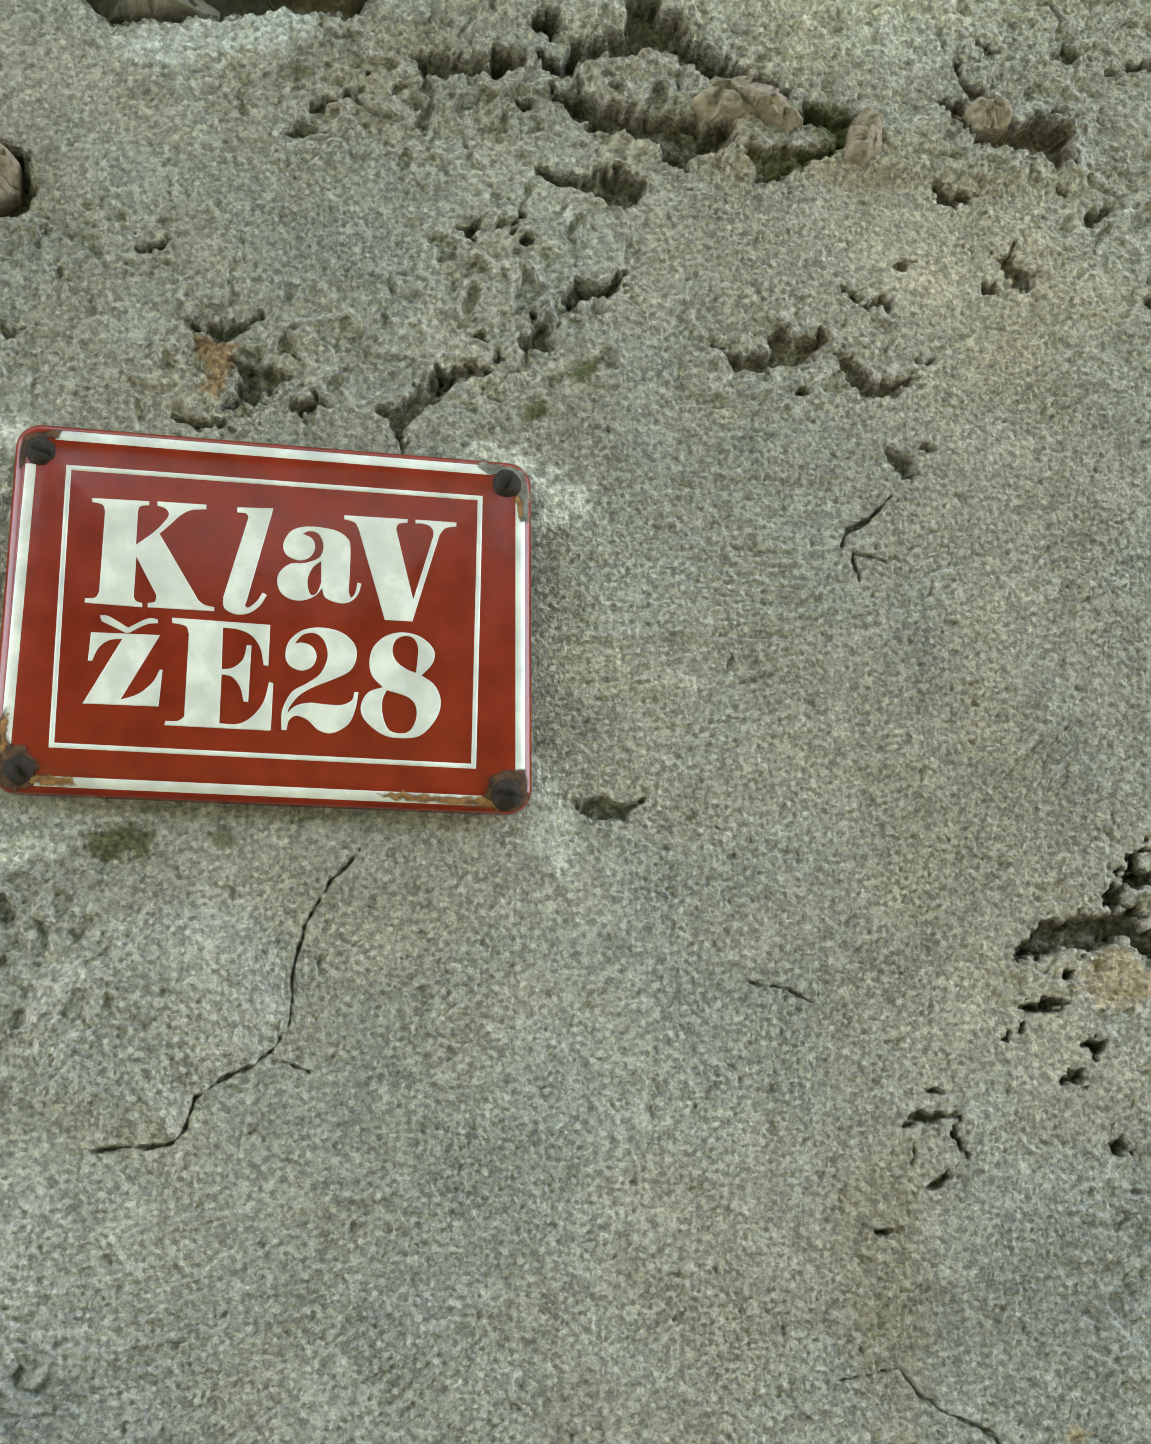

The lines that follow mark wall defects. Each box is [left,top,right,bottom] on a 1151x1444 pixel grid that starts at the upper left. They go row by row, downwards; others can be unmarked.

spalling [81,0,293,27]
flaking render [1000,835,1151,1042]
crack [90,847,361,1154]
flaking render [1059,1033,1111,1089]
crack [835,1368,1005,1444]